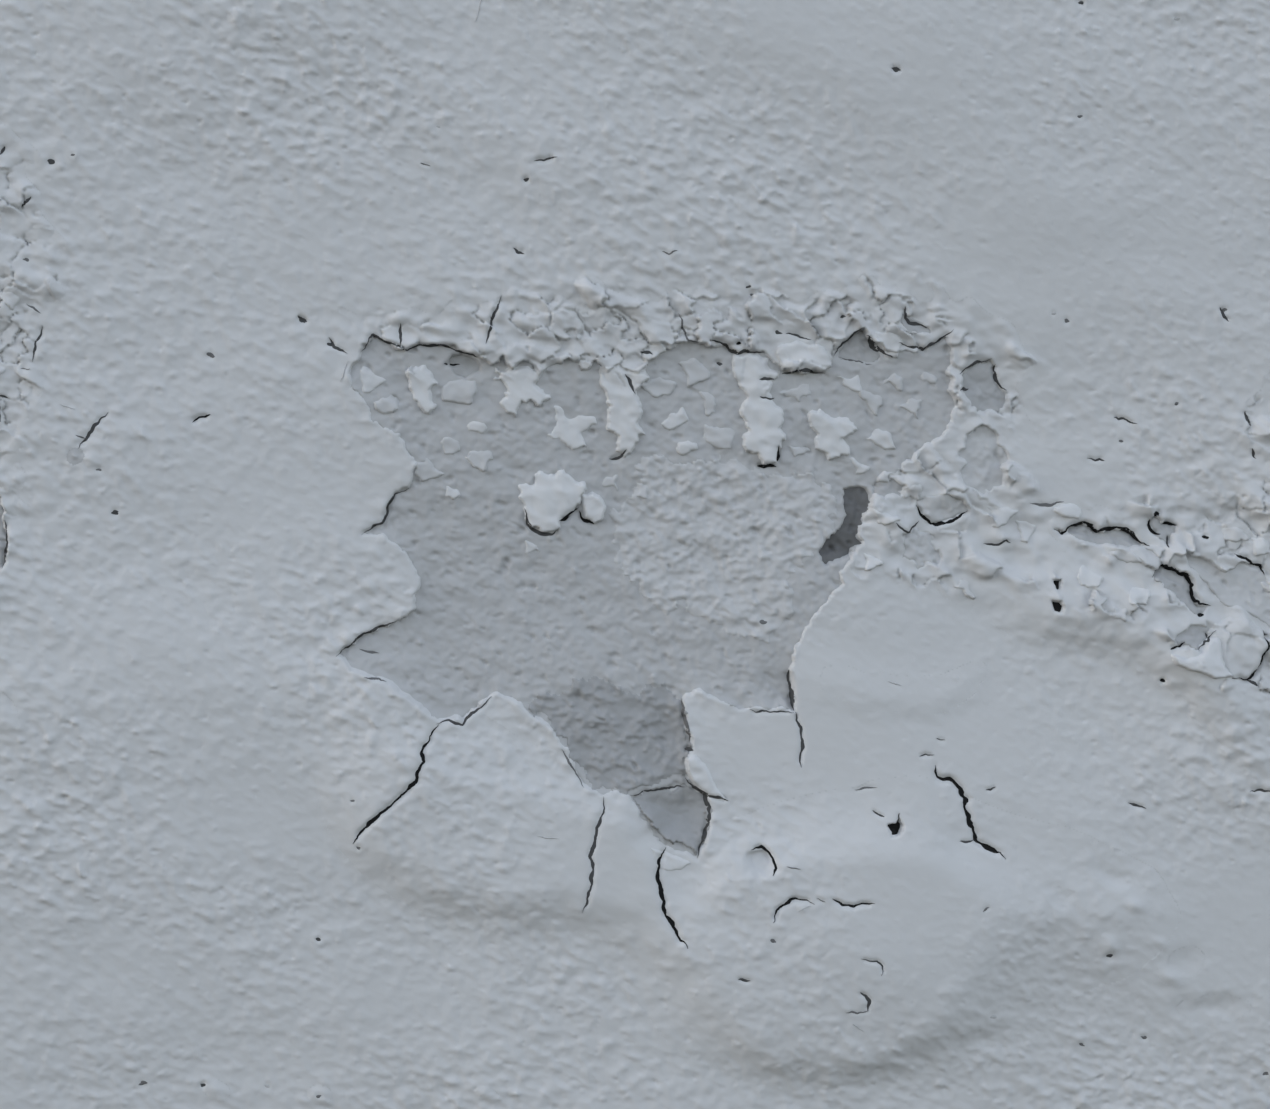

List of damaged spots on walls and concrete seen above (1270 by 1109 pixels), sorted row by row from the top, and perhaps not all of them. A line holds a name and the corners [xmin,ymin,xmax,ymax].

spalling [0,122,68,568]
crack [1244,412,1256,459]
spalling [338,272,1270,871]
crack [1235,554,1264,574]
crack [1232,632,1270,686]
crack [353,697,491,843]
crack [563,698,728,913]
crack [919,738,1006,859]
crack [655,848,688,949]
crack [752,845,875,923]